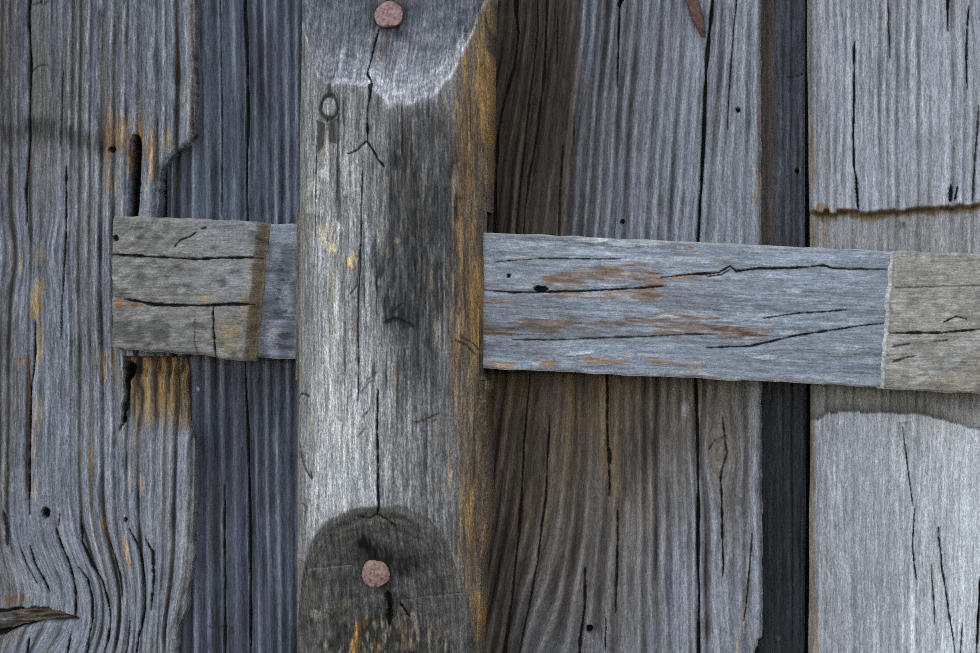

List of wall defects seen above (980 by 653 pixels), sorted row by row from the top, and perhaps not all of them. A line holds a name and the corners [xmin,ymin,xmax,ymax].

crack [23,0,68,340]
crack [112,253,264,261]
crack [314,29,396,527]
rust [364,0,417,76]
crack [695,0,738,242]
crack [484,264,980,294]
crack [512,309,980,349]
crack [851,41,860,209]
crack [945,0,980,204]
crack [1,320,50,593]
crack [55,511,156,653]
crack [901,425,980,653]